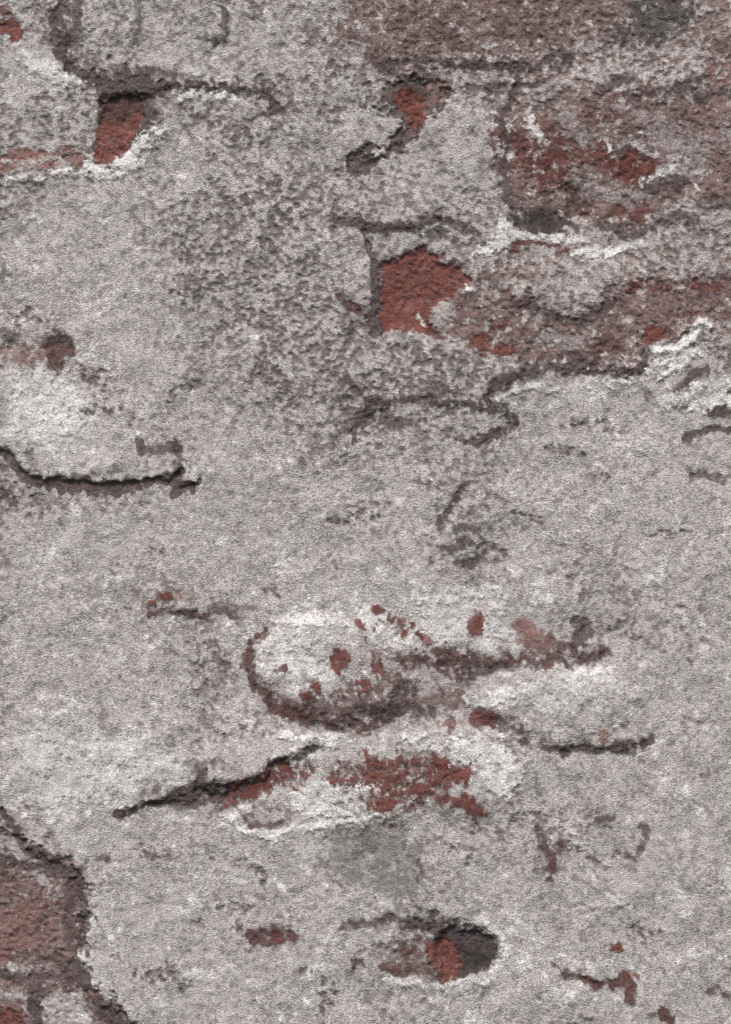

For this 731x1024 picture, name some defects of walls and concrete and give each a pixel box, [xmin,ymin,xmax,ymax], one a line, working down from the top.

spalling [0,92,146,174]
spalling [346,70,453,177]
spalling [487,80,731,232]
spalling [377,244,731,409]
crack [0,437,202,507]
spalling [203,620,488,829]
spalling [469,706,530,752]
crack [112,743,326,830]
spalling [0,815,138,1024]
spalling [350,922,499,984]